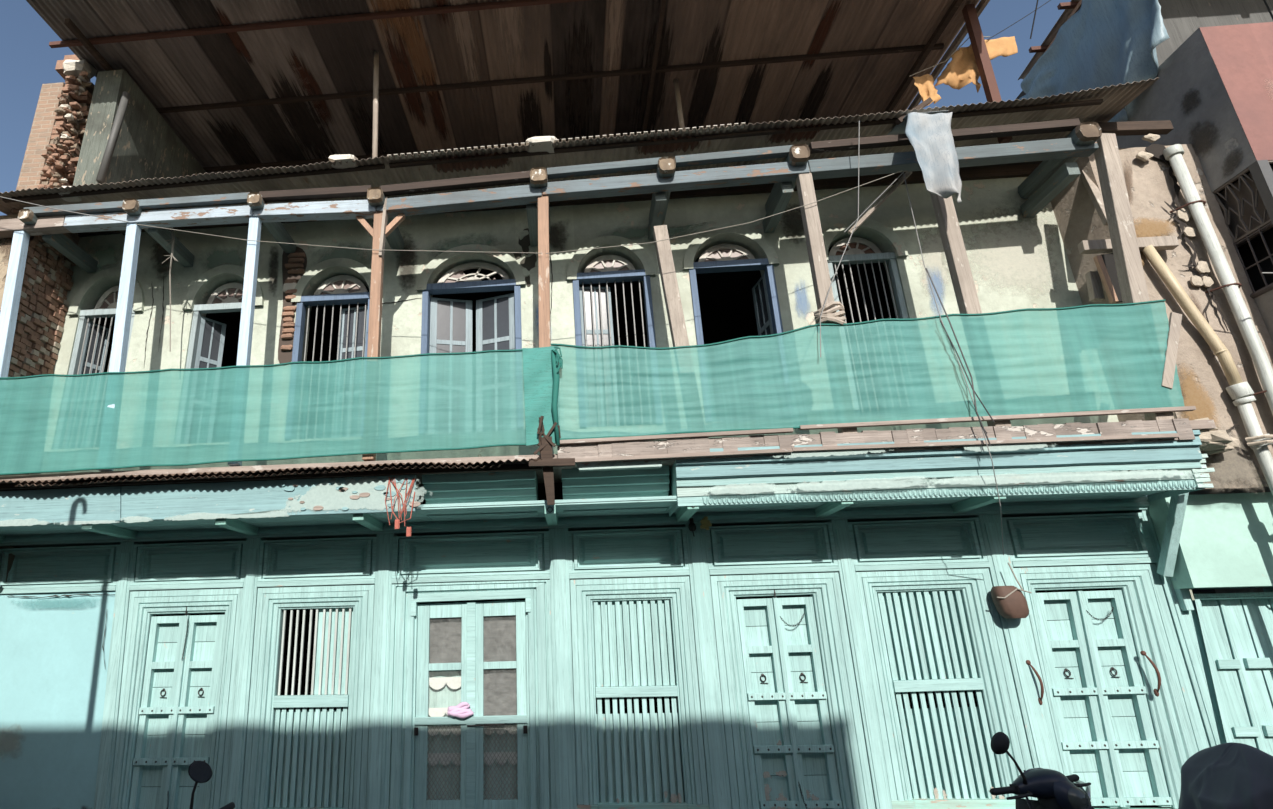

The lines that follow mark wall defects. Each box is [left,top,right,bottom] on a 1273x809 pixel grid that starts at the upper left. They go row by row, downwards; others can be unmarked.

rust [802,0,841,69]
rust [289,50,333,127]
rust [387,32,449,140]
crack [144,276,164,364]
peeling [773,448,891,458]
peeling [705,470,1197,494]
peeling [963,442,1048,452]